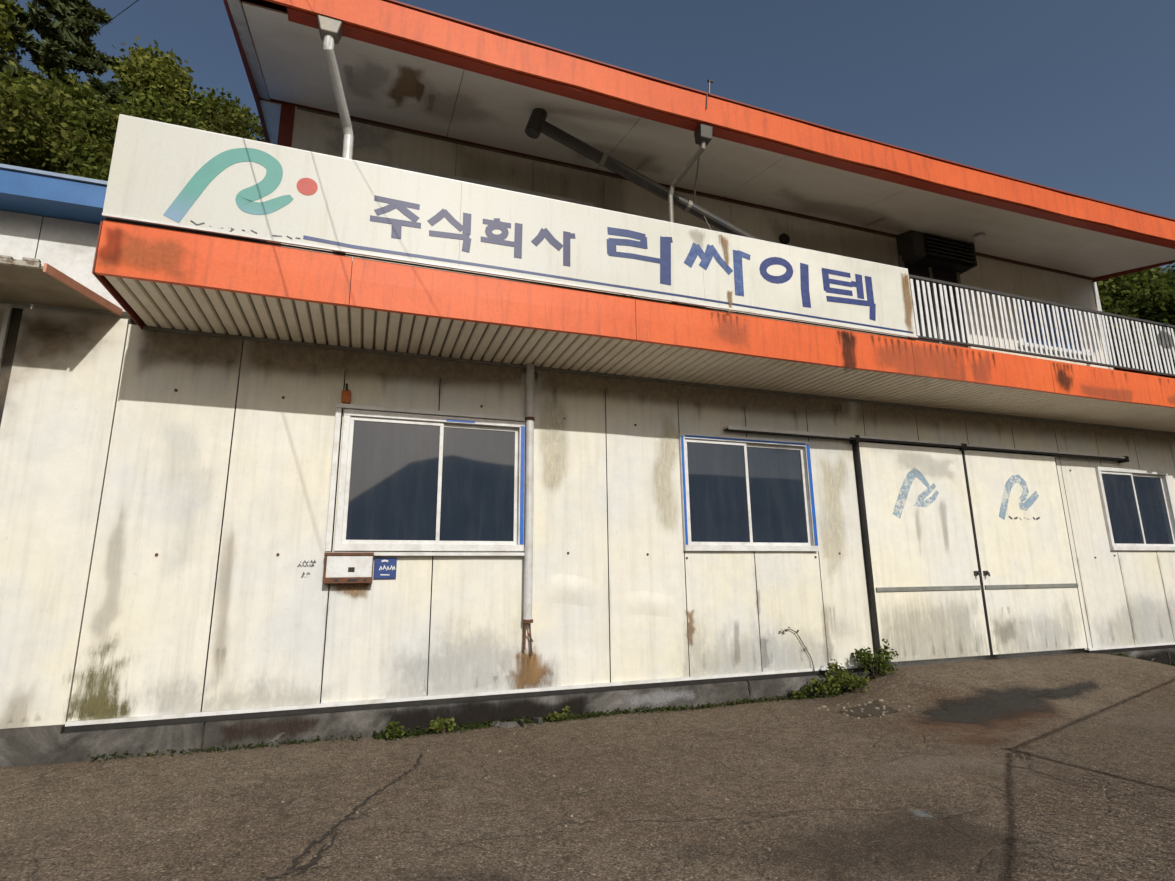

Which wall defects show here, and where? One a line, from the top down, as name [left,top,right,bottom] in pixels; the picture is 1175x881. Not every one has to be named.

rust [686,612,694,645]
rust [513,652,550,689]
crack [265,752,423,881]